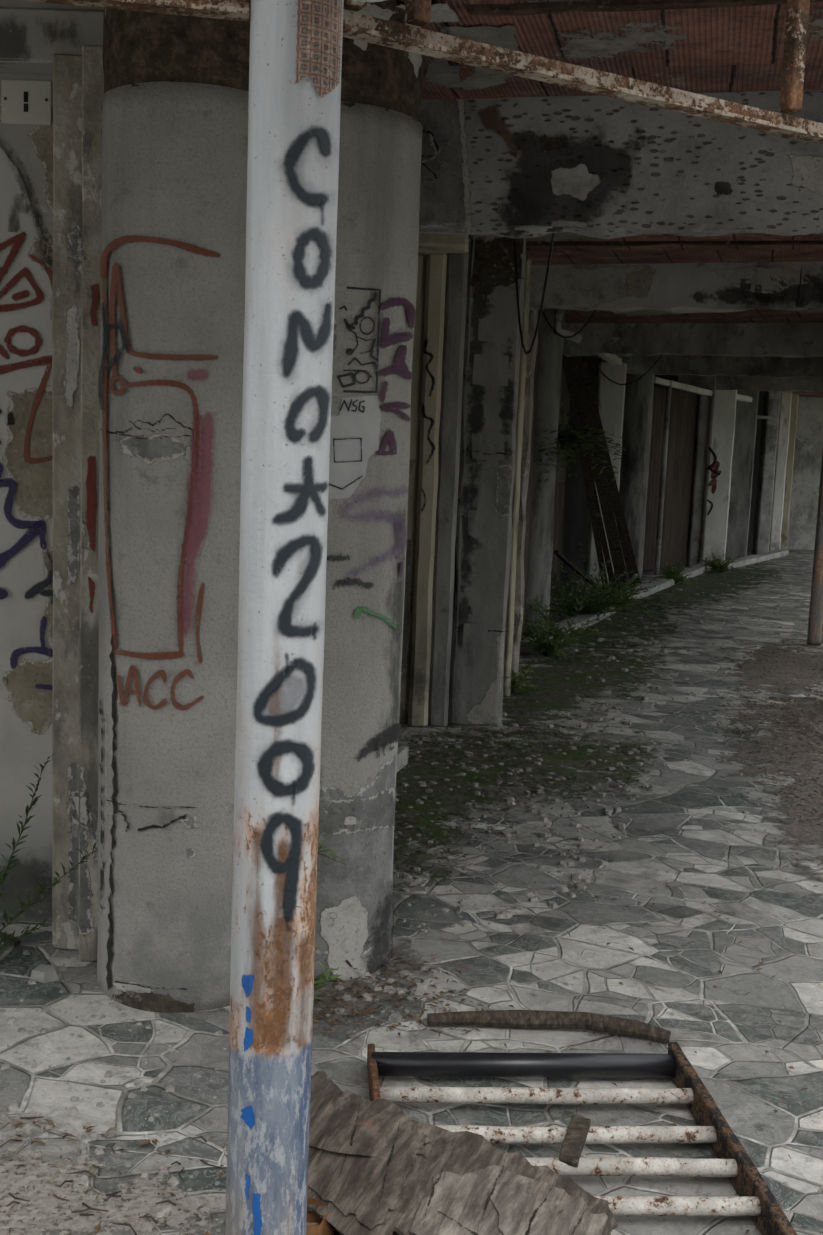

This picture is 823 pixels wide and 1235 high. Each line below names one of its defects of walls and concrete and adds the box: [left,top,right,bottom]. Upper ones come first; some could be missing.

damp [456,127,648,647]
flaking render [401,539,413,675]
crack [99,498,199,991]
corrosion [252,842,308,1046]
flaking render [315,754,396,981]